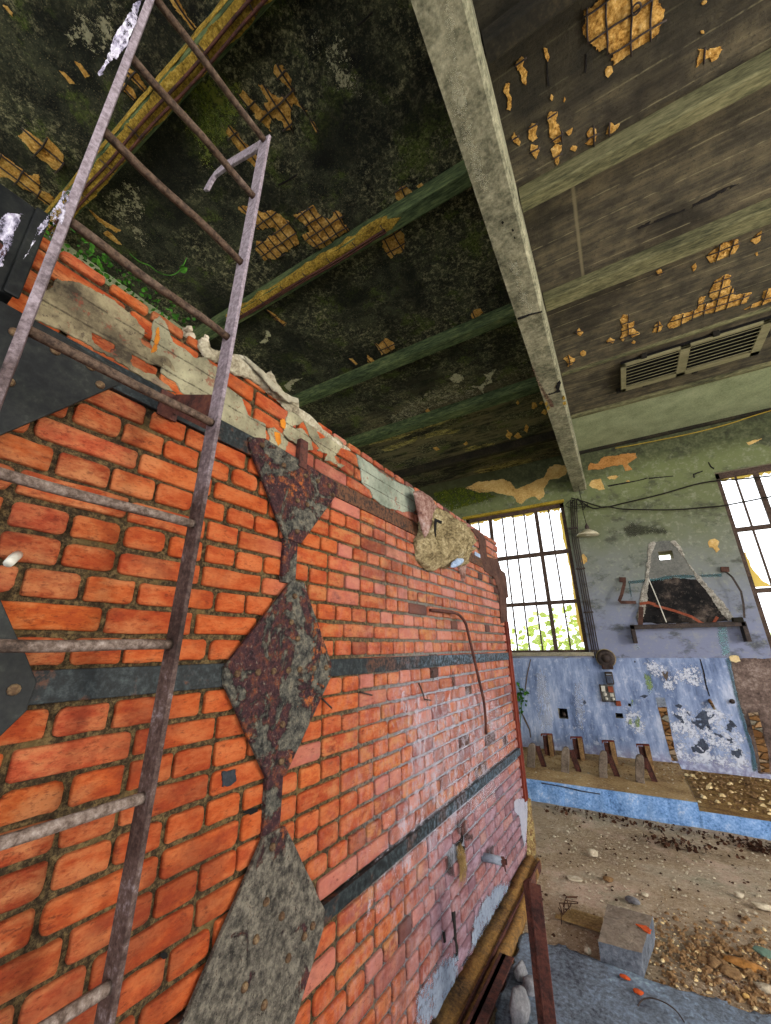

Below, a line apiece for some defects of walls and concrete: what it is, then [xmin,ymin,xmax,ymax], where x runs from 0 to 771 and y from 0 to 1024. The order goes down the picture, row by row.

leakage [65,4,121,52]
leakage [309,34,362,97]
spalling [582,0,667,77]
spalling [0,0,273,245]
leakage [182,73,247,165]
leakage [102,180,151,247]
spalling [225,205,406,327]
peeling [35,278,345,469]
leakage [391,369,496,423]
leakage [369,419,458,451]
peeling [356,454,416,512]
peeling [658,655,771,774]